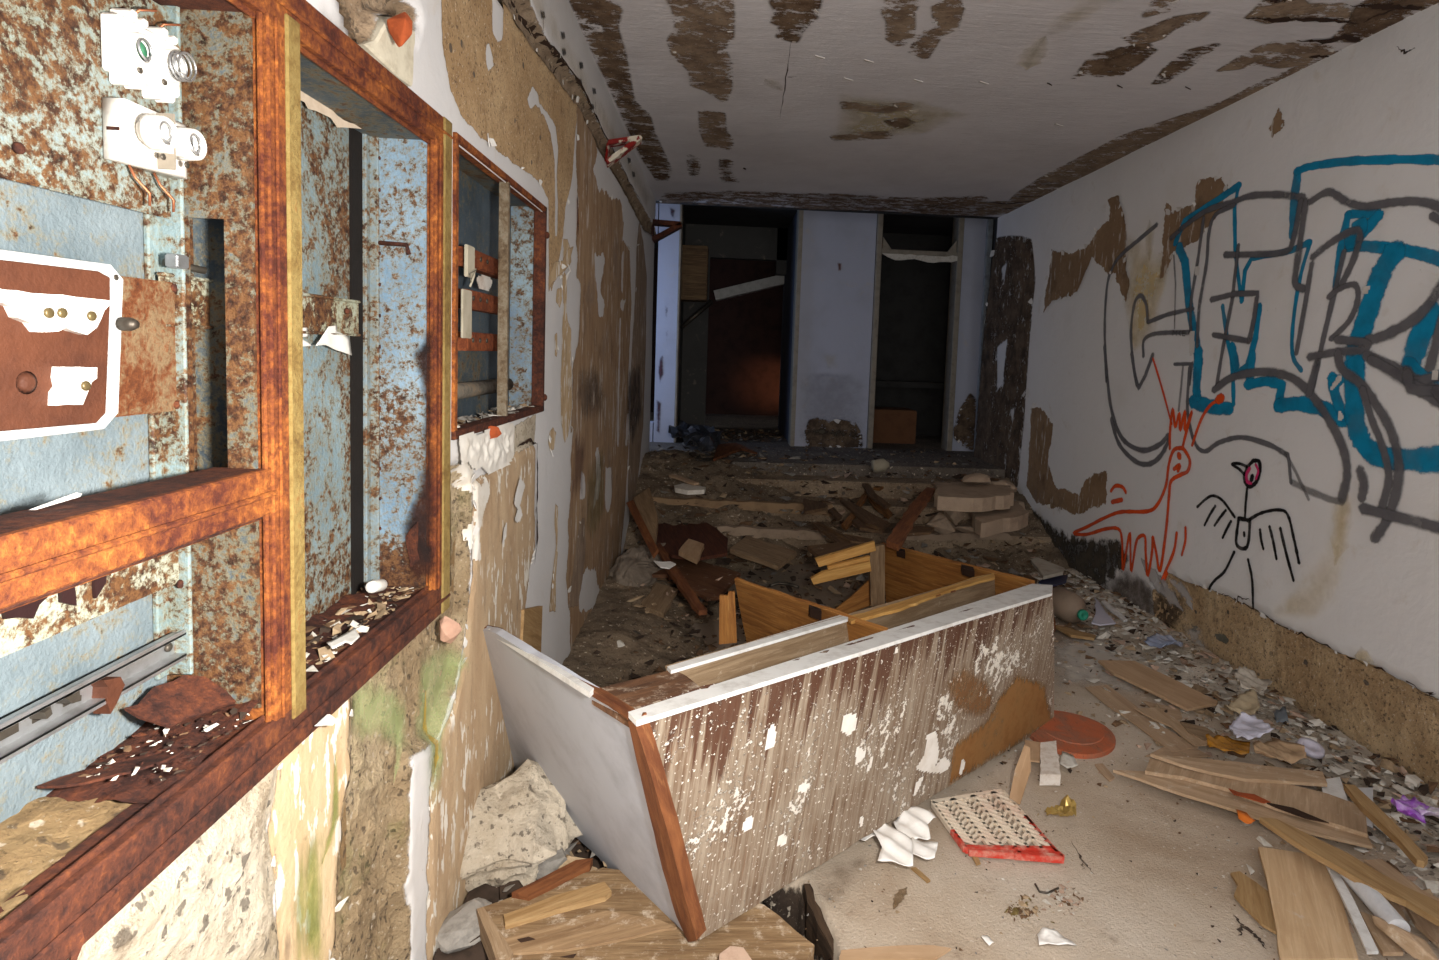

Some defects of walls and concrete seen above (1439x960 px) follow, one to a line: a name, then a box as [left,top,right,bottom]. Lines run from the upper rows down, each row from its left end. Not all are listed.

spalling [336,0,417,44]
peeling [441,0,1439,648]
rust [406,336,434,575]
spalling [68,415,536,960]
leakage [423,693,439,769]
spalling [1152,573,1439,789]